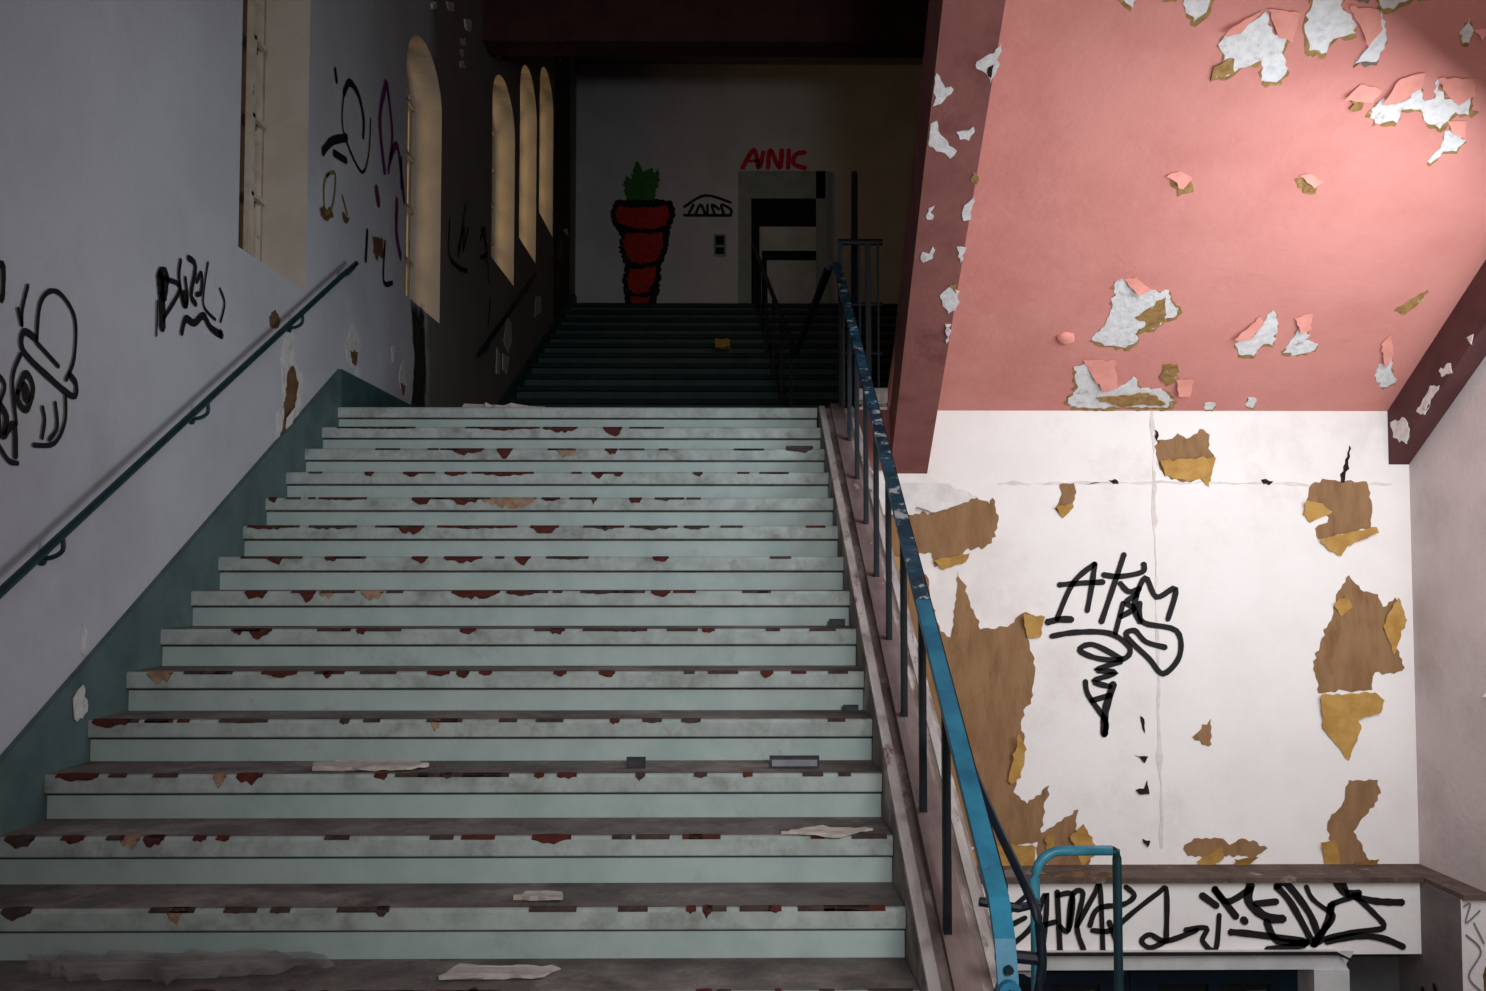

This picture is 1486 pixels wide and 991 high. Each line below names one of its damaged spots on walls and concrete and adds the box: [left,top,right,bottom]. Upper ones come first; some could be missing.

peeling [929,73,975,158]
peeling [1210,0,1479,167]
peeling [1064,277,1216,411]
peeling [375,497,597,535]
peeling [403,427,669,479]
peeling [1154,429,1216,487]
peeling [1303,446,1379,556]
peeling [451,590,696,600]
peeling [879,482,1112,877]
peeling [1313,575,1407,761]
peeling [1321,779,1381,865]
peeling [320,963,561,991]